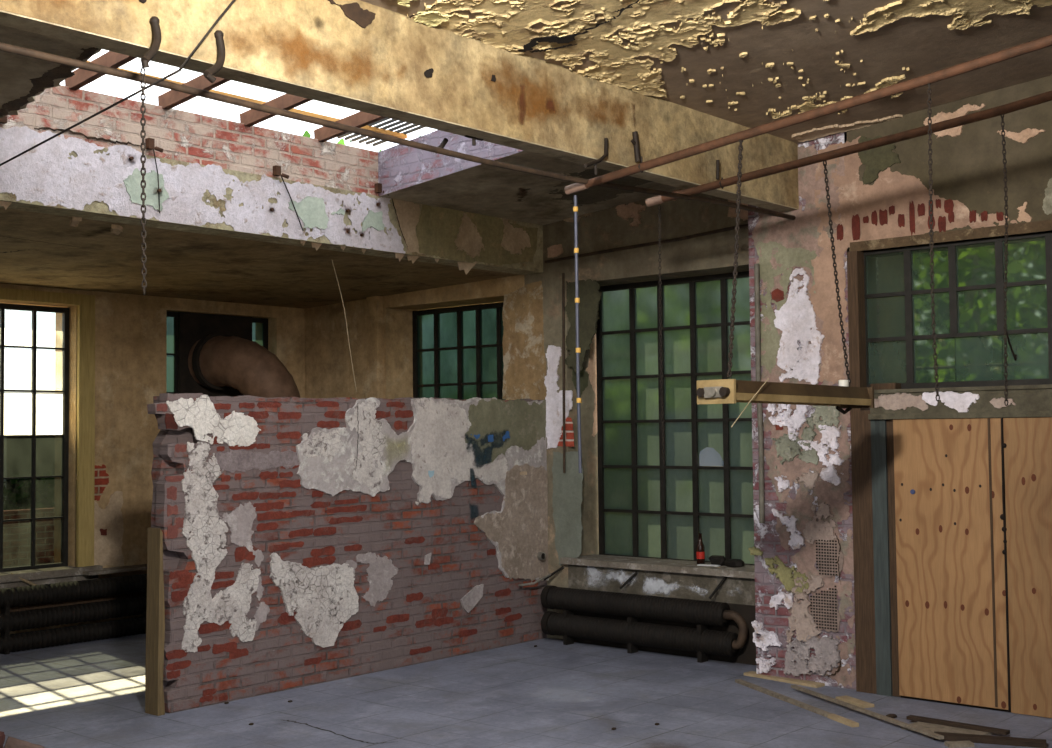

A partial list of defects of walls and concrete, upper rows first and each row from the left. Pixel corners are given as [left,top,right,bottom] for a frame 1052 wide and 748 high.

peeling [0,47,439,264]
leakage [282,33,370,79]
flaking render [328,0,376,28]
leakage [489,71,557,118]
crack [518,0,639,53]
peeling [398,0,1052,98]
peeling [997,128,1045,144]
flaking render [756,49,1032,385]
peeling [874,391,1016,412]
peeling [156,279,602,679]
peeling [766,404,844,550]
peeling [748,547,856,687]